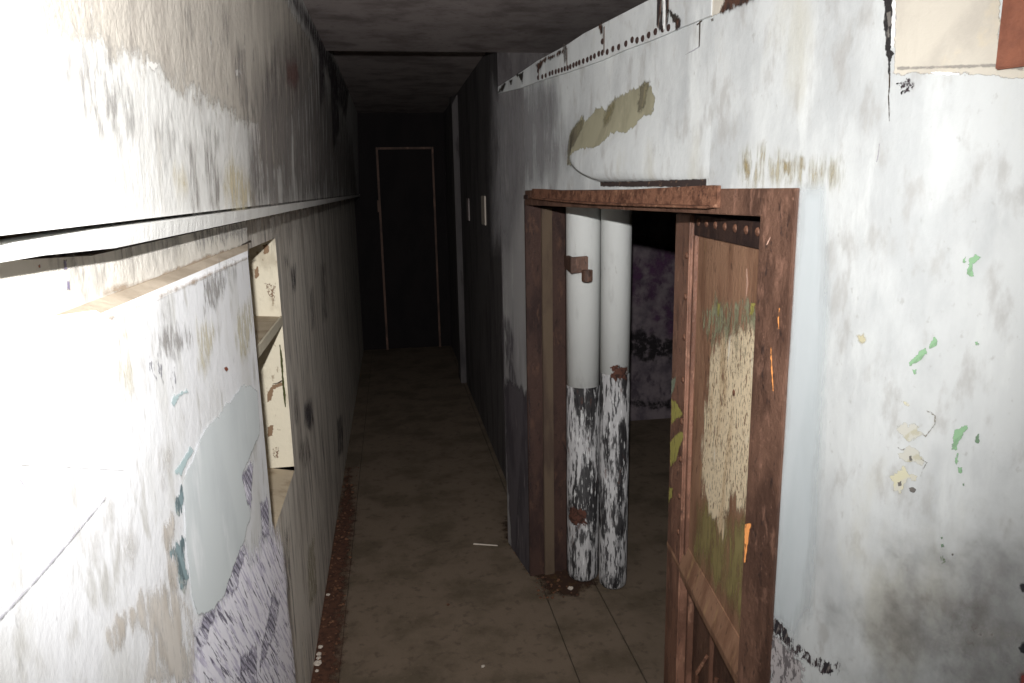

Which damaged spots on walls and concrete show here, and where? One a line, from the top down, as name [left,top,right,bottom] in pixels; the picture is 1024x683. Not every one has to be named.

peeling [567,82,655,165]
corrosion [610,364,628,381]
peeling [909,337,937,374]
peeling [890,411,936,494]
peeling [951,426,980,486]
corrosion [568,506,587,526]
peeling [106,447,296,683]